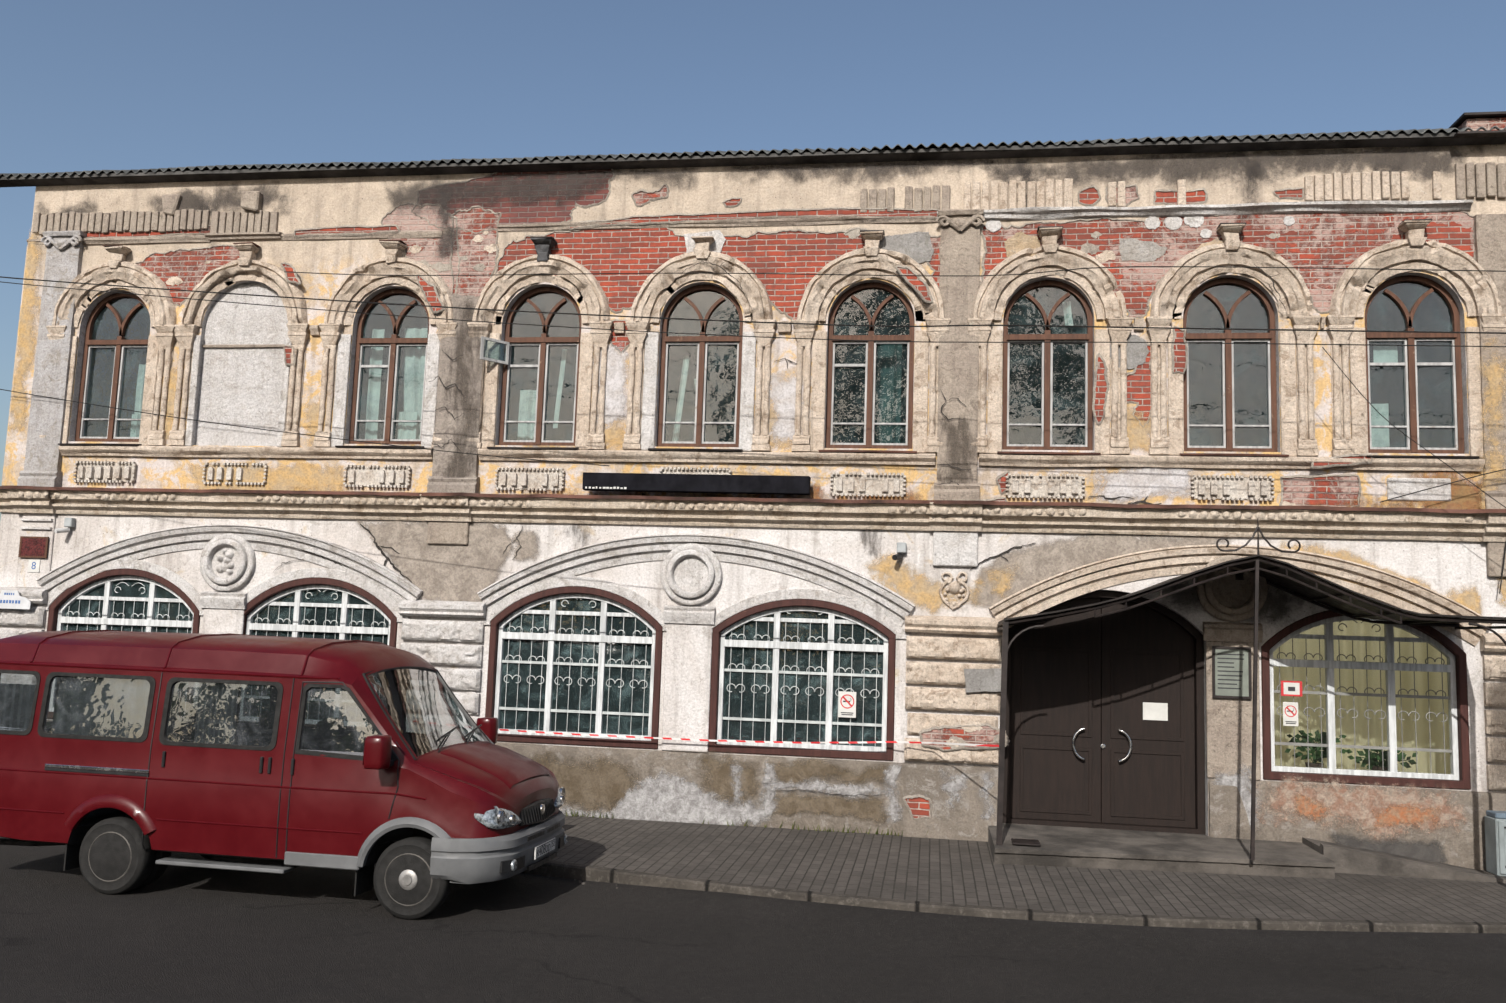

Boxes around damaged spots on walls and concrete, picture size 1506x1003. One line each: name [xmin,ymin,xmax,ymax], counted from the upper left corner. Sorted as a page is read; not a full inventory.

flaking render [86,225,240,307]
flaking render [979,184,1476,319]
flaking render [294,169,941,448]
leakage [944,419,969,483]
flaking render [1279,453,1373,507]
crack [274,549,342,571]
crack [360,524,412,583]
flaking render [903,794,932,820]